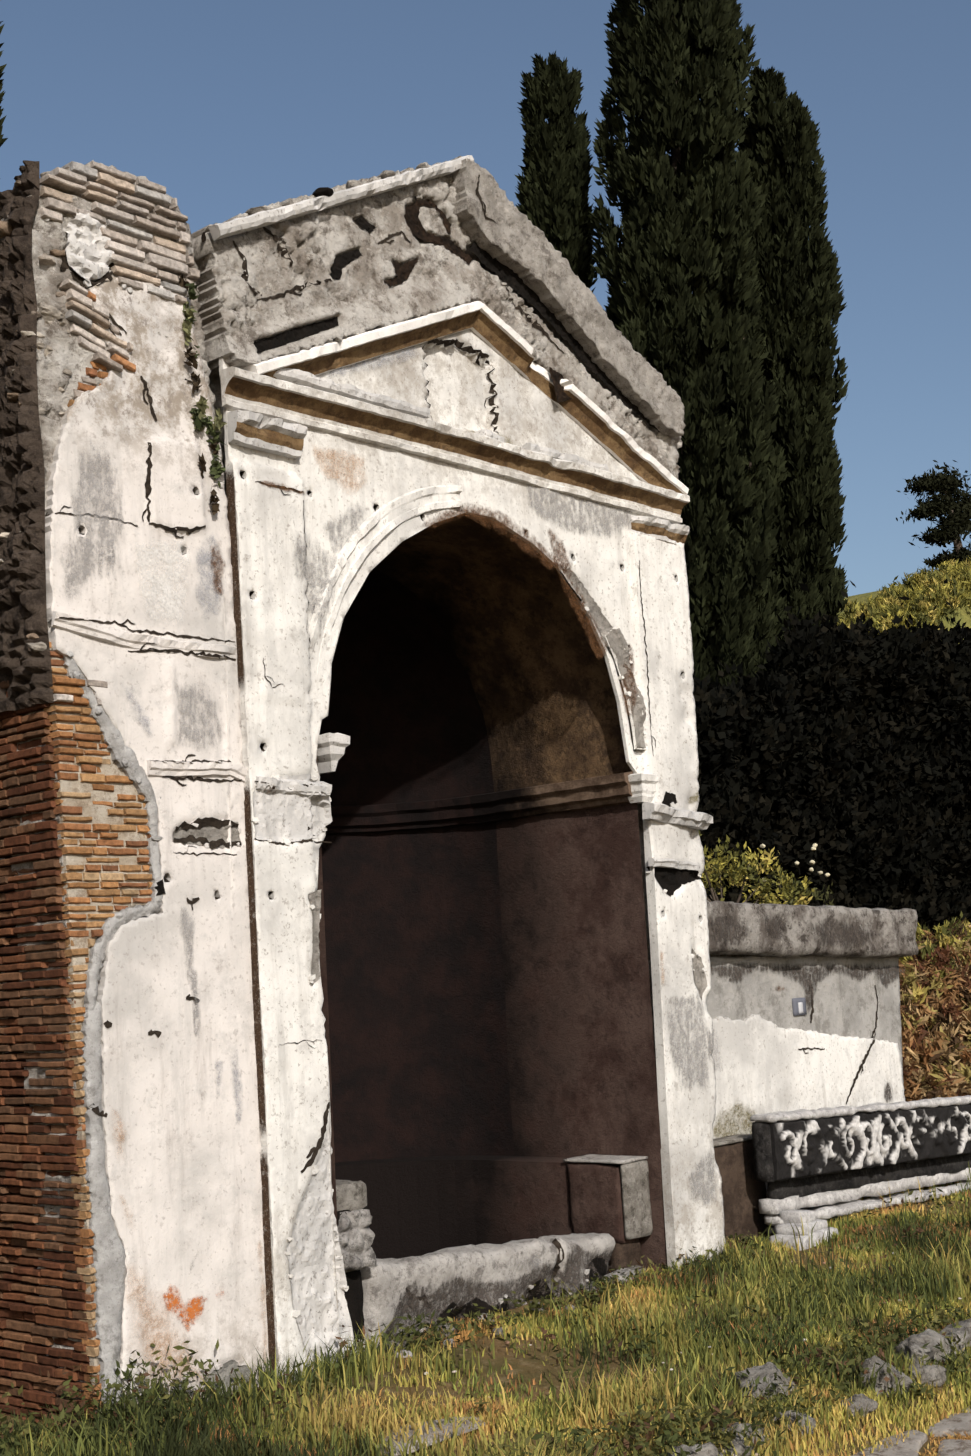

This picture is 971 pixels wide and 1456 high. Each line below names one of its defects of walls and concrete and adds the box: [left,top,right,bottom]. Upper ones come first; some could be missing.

spalling [38,161,200,407]
corrosion [164,1287,203,1330]
spalling [43,642,332,1418]
crack [301,1102,330,1173]
spalling [285,1135,353,1363]
crack [846,985,878,1104]